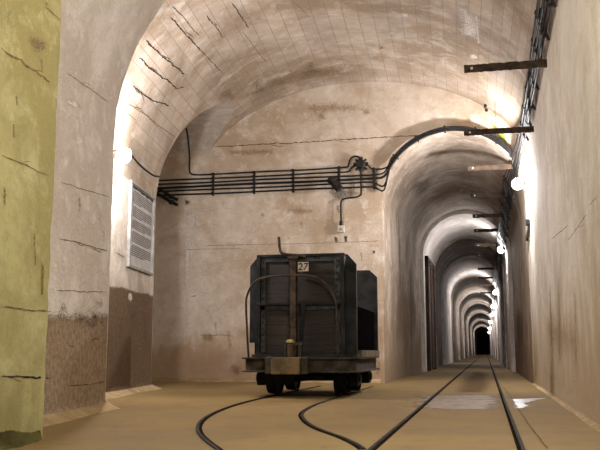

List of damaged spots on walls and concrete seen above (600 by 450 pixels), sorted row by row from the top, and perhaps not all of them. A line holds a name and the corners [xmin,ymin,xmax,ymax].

crack [1,47,50,83]
crack [139,40,184,89]
crack [170,6,222,72]
crack [128,85,174,136]
crack [215,135,417,147]
damp [44,286,153,415]